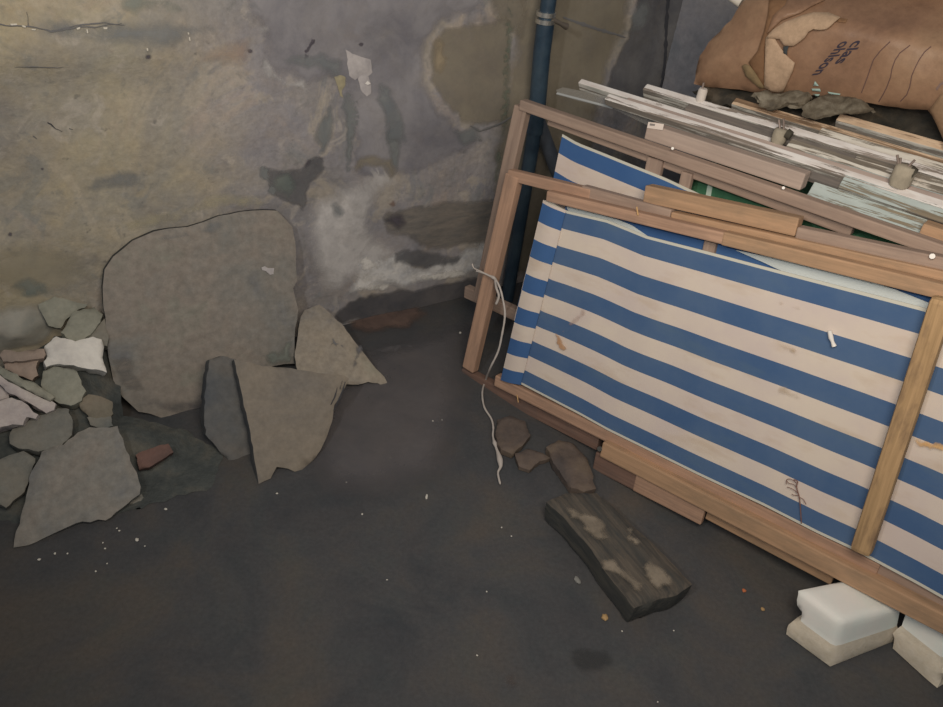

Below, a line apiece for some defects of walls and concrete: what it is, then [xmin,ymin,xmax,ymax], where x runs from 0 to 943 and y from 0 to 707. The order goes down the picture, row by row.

crack [0,12,122,33]
flaking render [261,157,323,208]
damp [250,0,494,322]